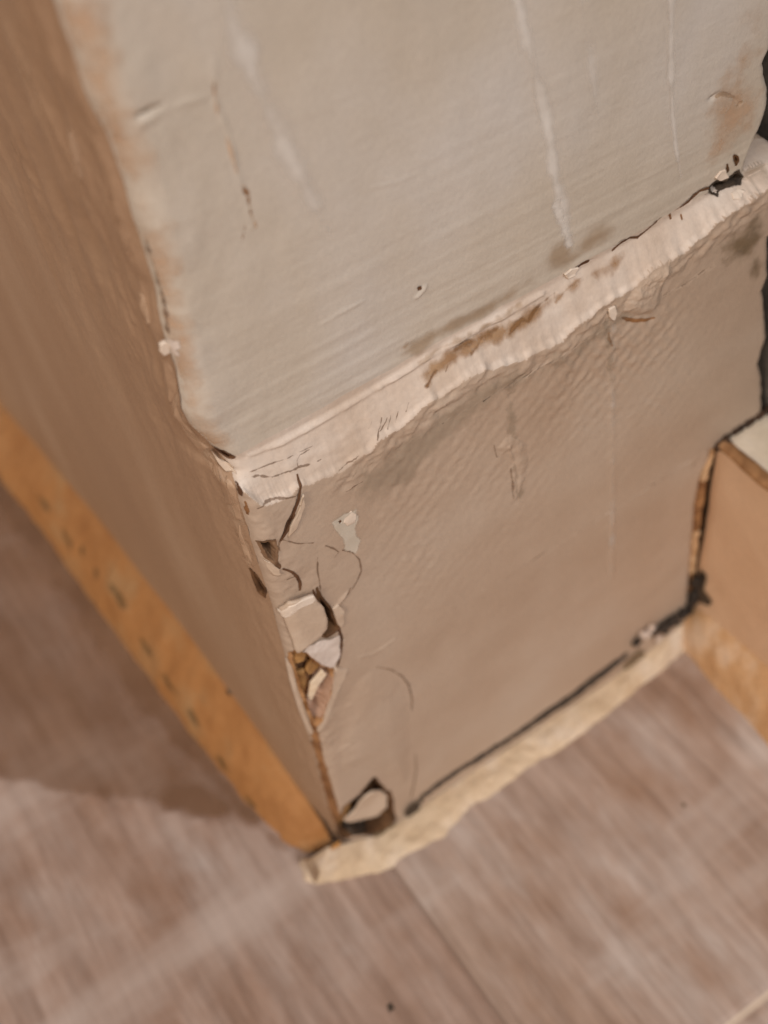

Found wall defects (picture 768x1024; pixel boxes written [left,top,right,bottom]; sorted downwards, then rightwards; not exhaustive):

spalling [709,169,745,200]
peeling [607,258,672,346]
crack [210,446,362,605]
spalling [276,587,348,735]
spalling [333,777,397,839]